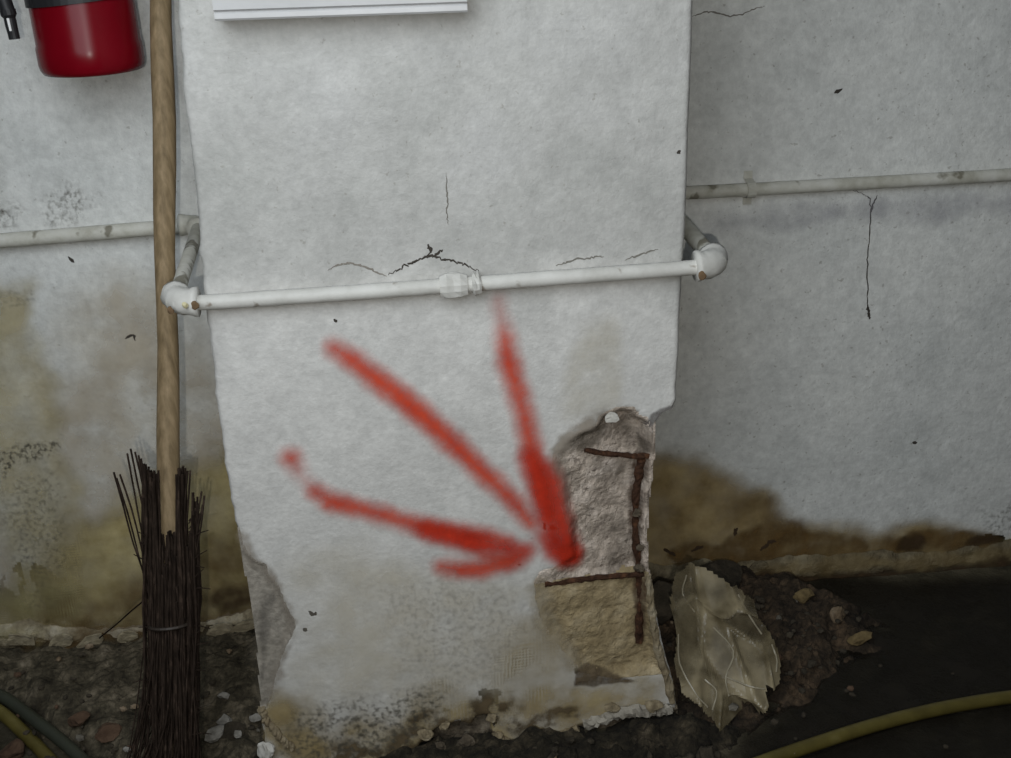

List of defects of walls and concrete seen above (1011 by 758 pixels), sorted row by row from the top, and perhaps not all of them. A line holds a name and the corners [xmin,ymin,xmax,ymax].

crack [556,249,658,266]
crack [853,190,877,319]
water stain [17,293,157,640]
water stain [180,417,252,622]
spalling [534,406,712,732]
water stain [647,457,998,576]
flaking render [737,539,1011,577]
flaking render [238,527,308,758]
flaking render [205,714,242,743]
water stain [267,689,651,758]
flaking render [417,713,512,750]